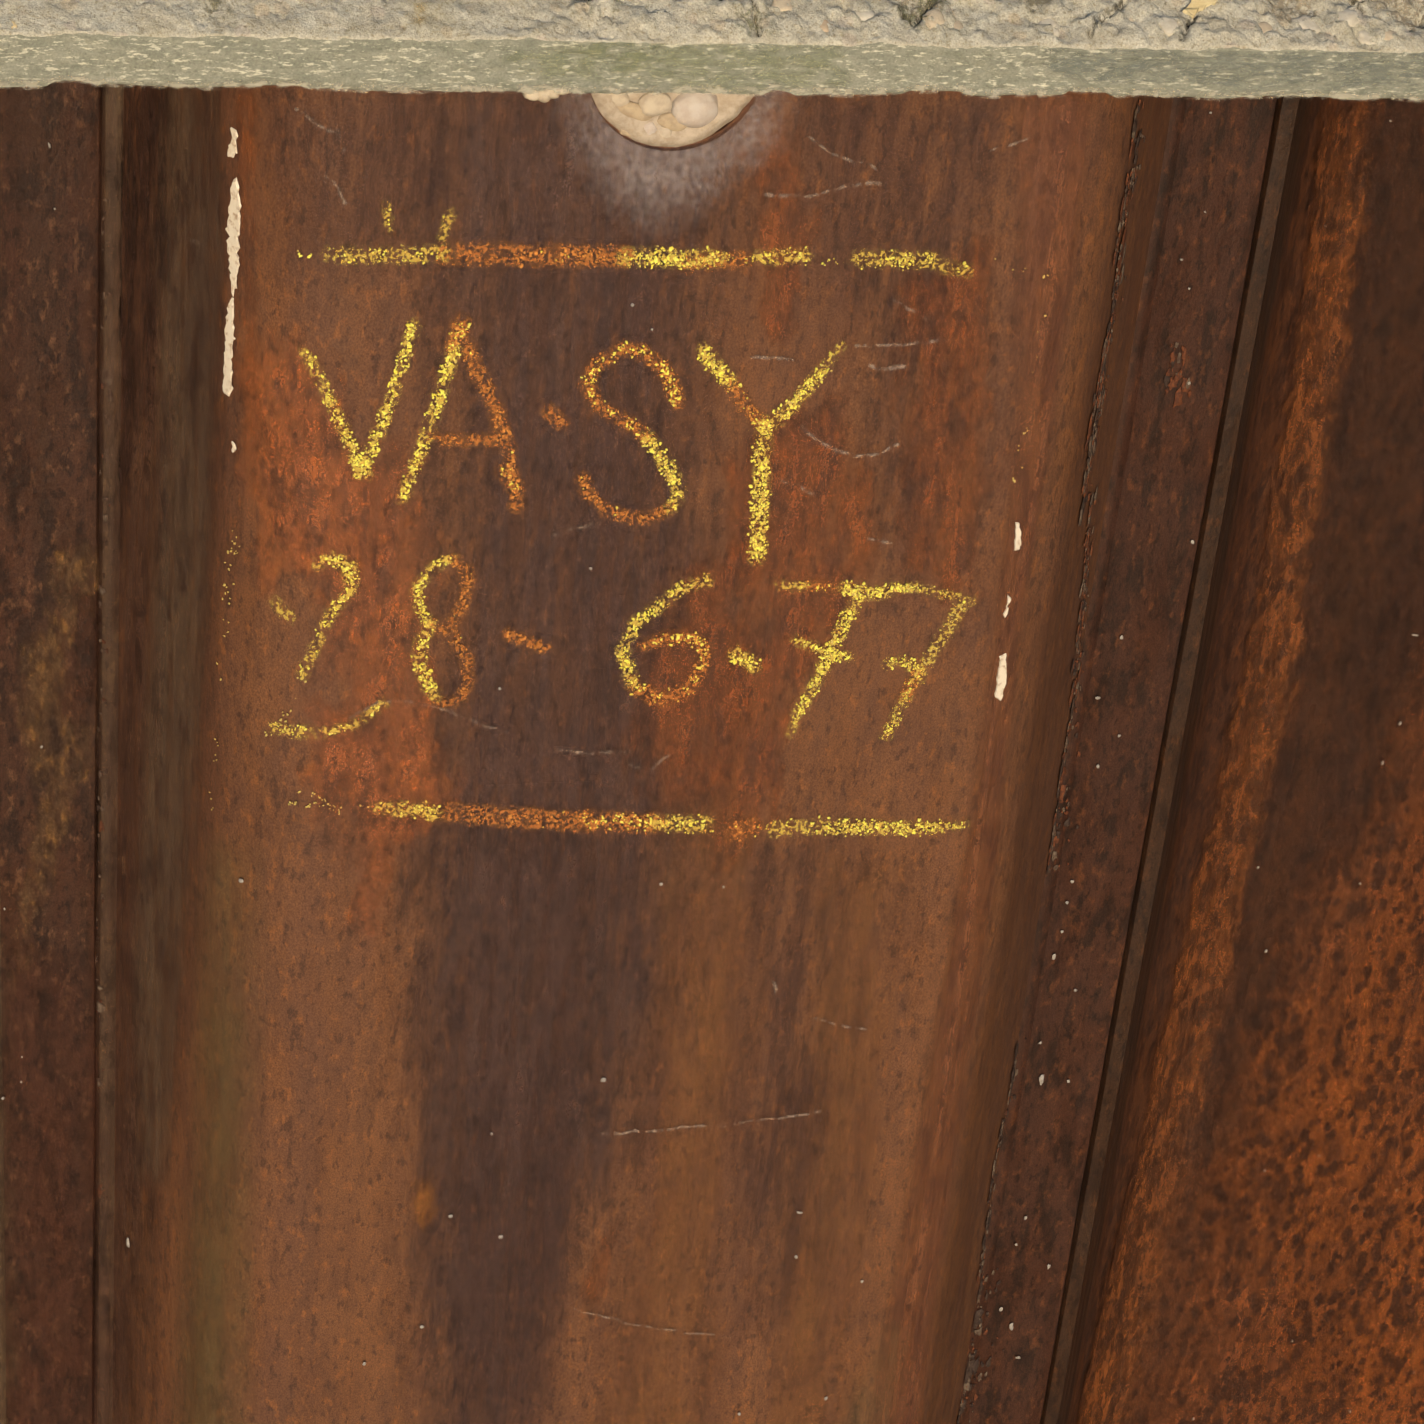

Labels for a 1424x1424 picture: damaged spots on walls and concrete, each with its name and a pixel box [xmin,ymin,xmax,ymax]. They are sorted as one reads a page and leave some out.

water stain [224,81,412,92]
water stain [746,85,852,95]
water stain [871,86,935,94]
water stain [958,85,1225,98]
water stain [1248,92,1419,100]
rust [754,141,806,335]
rust [241,358,438,840]
rust [633,405,871,872]
water stain [419,85,728,1424]
rust [873,97,1082,1424]
rust [1079,100,1424,1424]